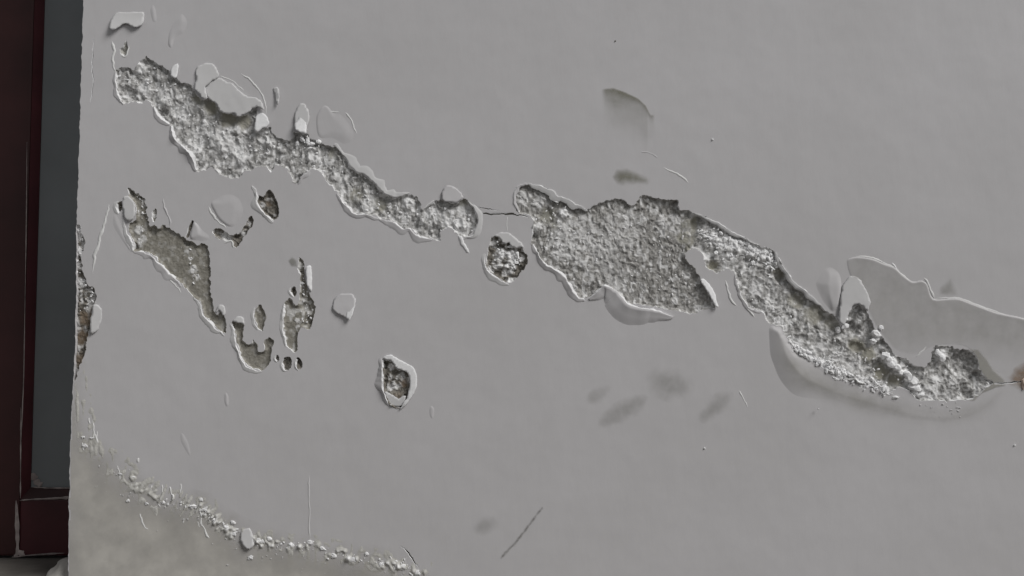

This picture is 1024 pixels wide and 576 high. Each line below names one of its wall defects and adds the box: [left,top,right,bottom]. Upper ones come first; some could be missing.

flaking render [74,225,102,381]
flaking render [112,42,1024,418]
damp [69,370,433,576]